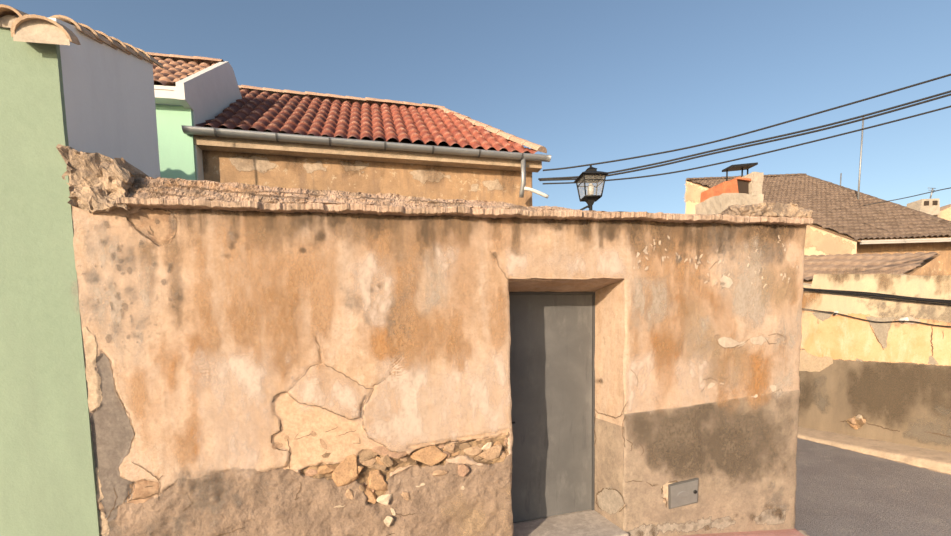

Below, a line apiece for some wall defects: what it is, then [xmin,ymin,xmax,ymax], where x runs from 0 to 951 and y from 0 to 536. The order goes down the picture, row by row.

water stain [494,217,527,274]
peeling [633,235,733,289]
water stain [579,220,820,323]
peeling [82,326,136,536]
crack [289,337,396,417]
water stain [196,209,510,444]
flaking render [270,392,510,527]
water stain [628,354,773,478]
peeling [716,334,784,349]
peeling [799,349,833,372]
peeling [866,316,896,350]
water stain [848,363,951,421]